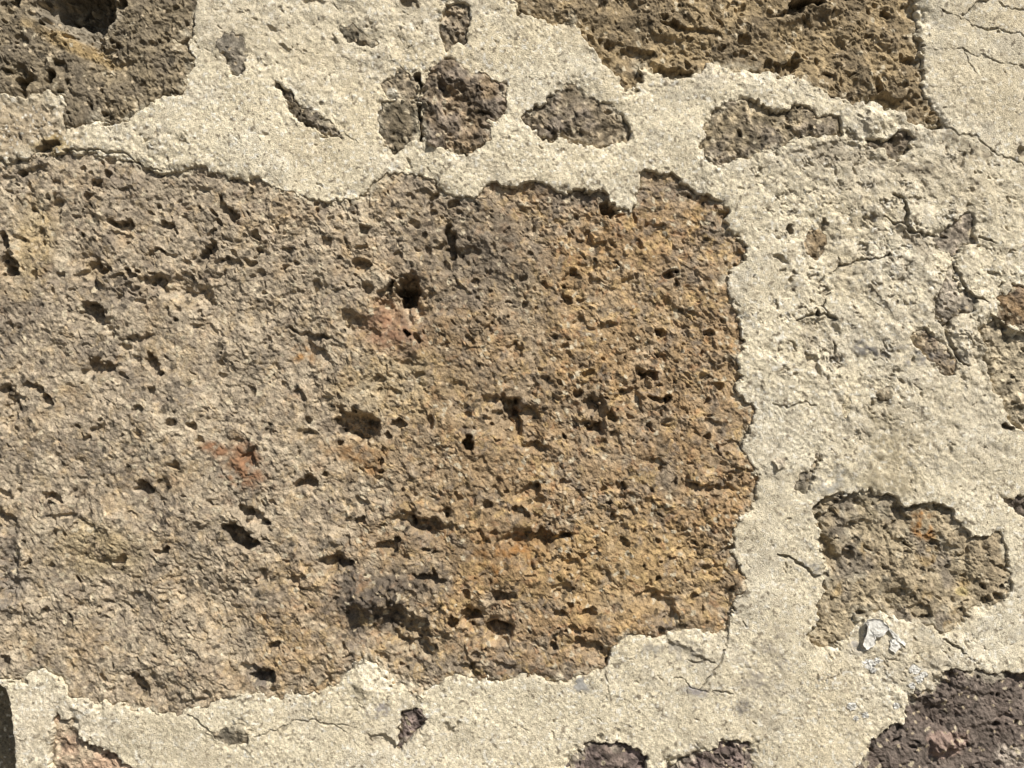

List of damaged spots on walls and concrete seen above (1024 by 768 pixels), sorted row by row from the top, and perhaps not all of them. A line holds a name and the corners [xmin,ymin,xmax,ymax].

crack [927,0,1024,74]
crack [941,121,1024,166]
spalling [216,193,243,227]
crack [884,193,939,240]
spalling [0,229,22,283]
crack [833,253,891,273]
crack [952,261,987,302]
spalling [71,299,115,327]
spalling [144,351,165,381]
spalling [316,553,356,572]
spalling [454,590,520,649]
peeling [848,617,906,673]